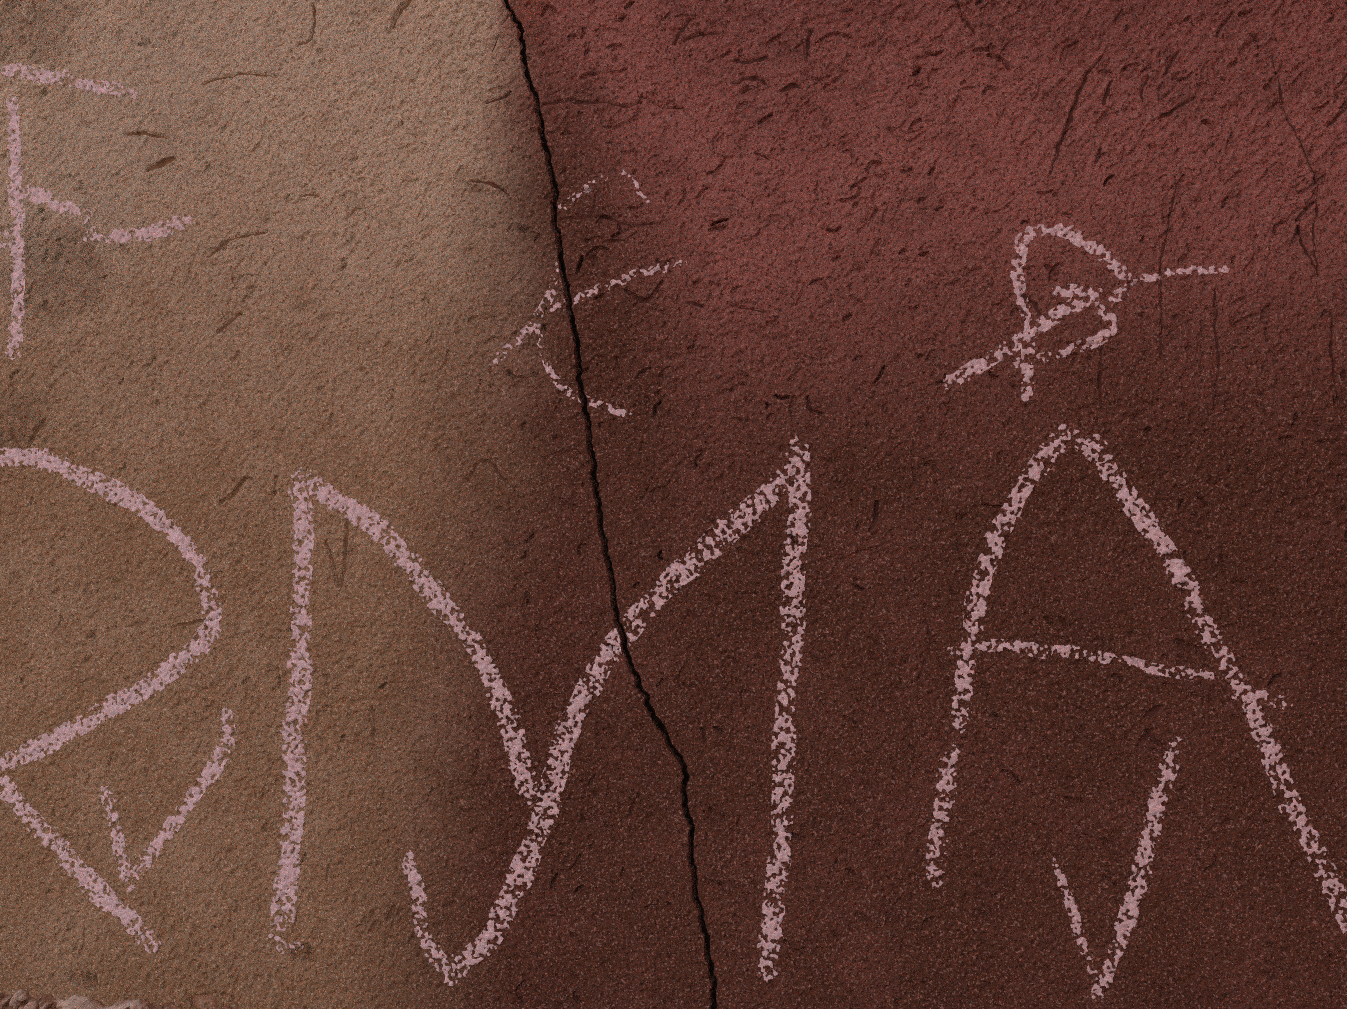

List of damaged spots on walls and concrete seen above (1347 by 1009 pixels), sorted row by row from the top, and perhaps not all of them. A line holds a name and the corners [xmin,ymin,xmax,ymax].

crack [504,0,717,1009]